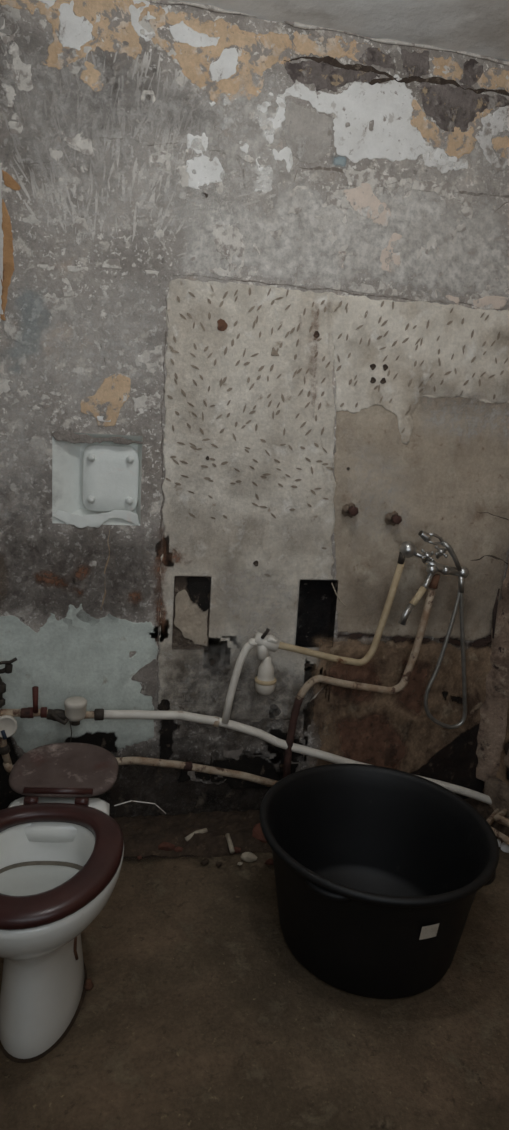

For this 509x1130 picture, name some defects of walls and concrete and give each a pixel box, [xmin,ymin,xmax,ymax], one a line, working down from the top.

peeling [0,0,509,272]
crack [284,56,509,96]
peeling [0,164,21,322]
peeling [80,373,131,427]
peeling [0,604,170,753]
spalling [172,576,212,650]